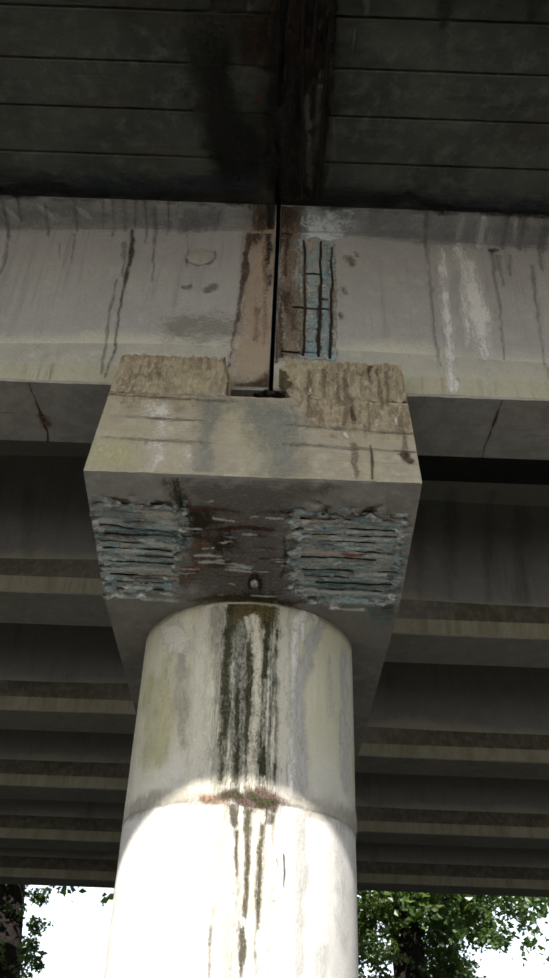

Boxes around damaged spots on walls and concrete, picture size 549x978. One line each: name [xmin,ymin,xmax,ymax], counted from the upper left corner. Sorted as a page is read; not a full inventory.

water stain [300,117,549,253]
corrosion [235,204,303,382]
spalling [281,237,338,361]
water stain [437,237,491,393]
crack [29,384,51,442]
corrosion [306,367,356,424]
corrosion [351,443,359,476]
corrosion [399,416,415,464]
crack [481,401,502,458]
spalling [88,495,412,611]
water stain [130,399,332,978]